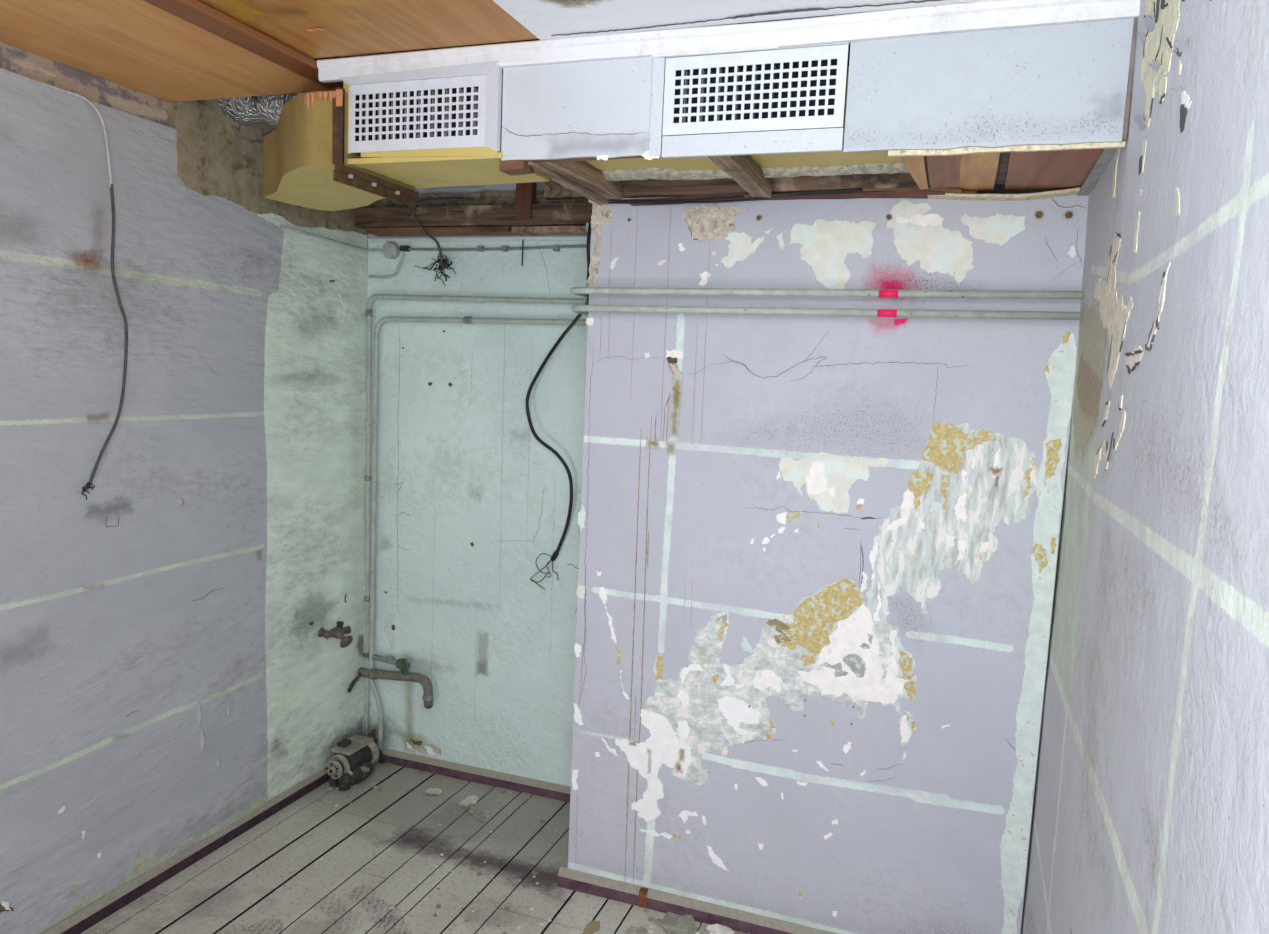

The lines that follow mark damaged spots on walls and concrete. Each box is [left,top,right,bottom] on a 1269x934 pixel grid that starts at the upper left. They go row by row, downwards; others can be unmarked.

peeling [1133,0,1192,196]
peeling [1112,148,1120,198]
peeling [586,204,619,287]
peeling [678,199,1026,289]
crack [1045,199,1085,277]
crack [693,333,971,418]
peeling [1093,212,1171,479]
peeling [578,503,586,531]
peeling [576,571,629,699]
peeling [595,331,1077,934]
peeling [574,703,584,725]
flaking render [583,921,600,934]